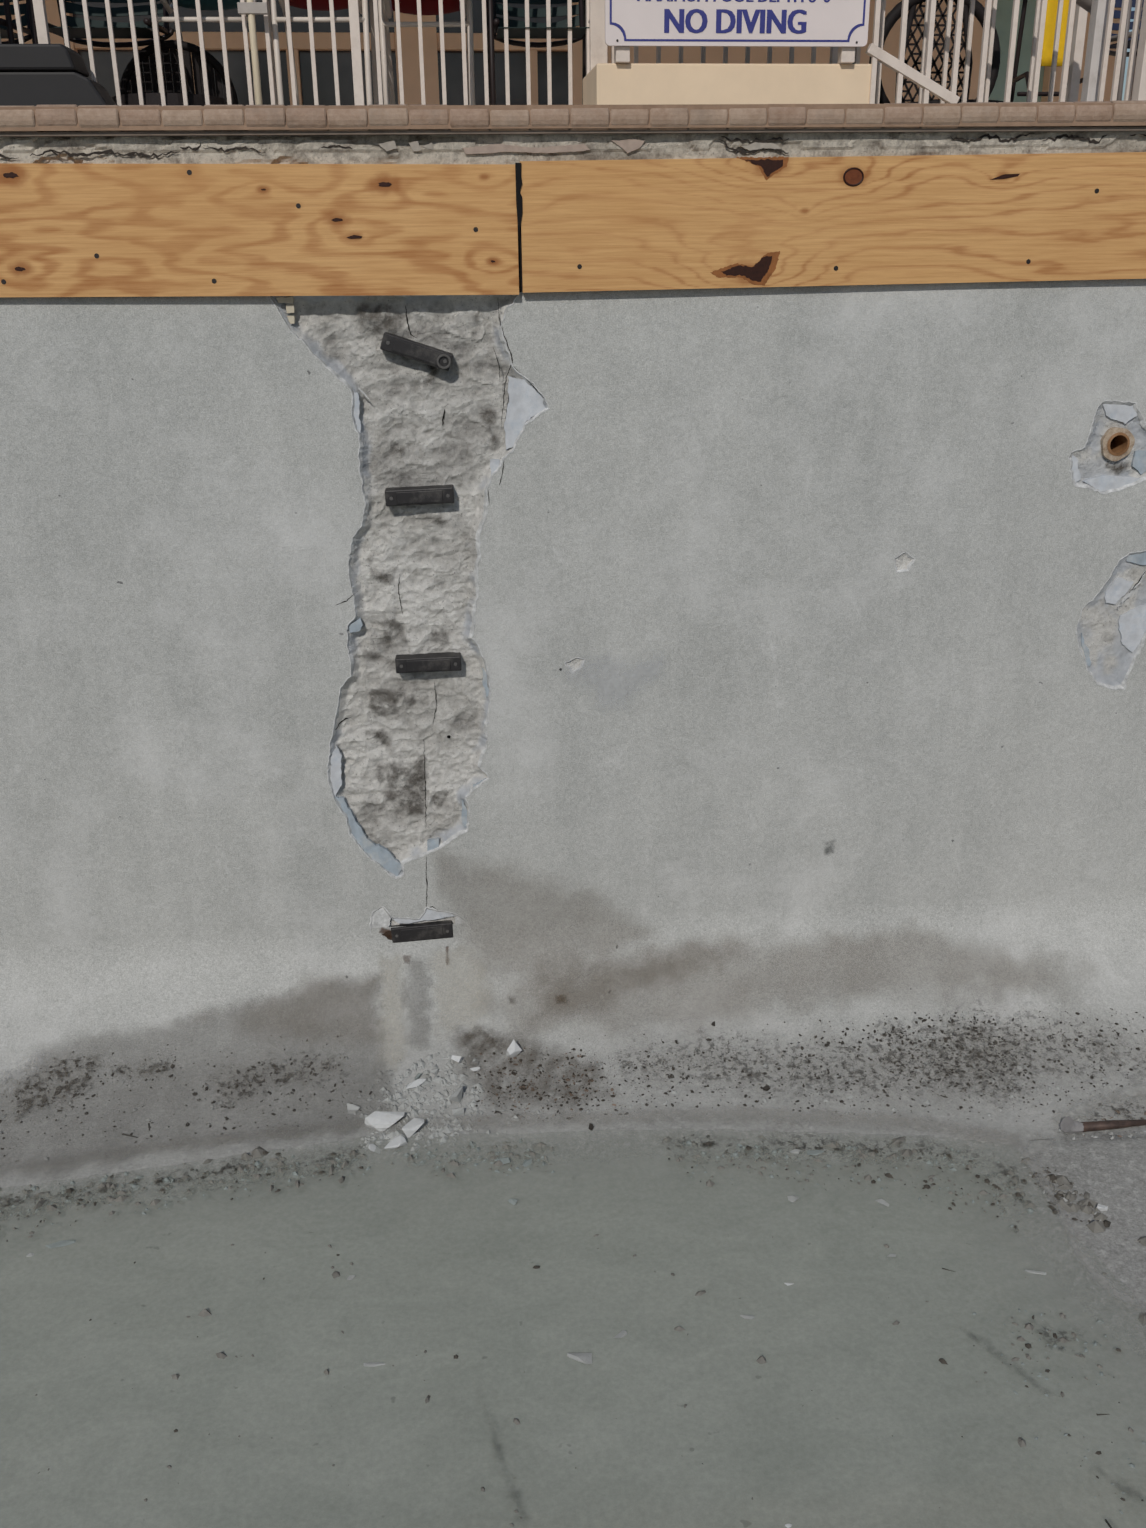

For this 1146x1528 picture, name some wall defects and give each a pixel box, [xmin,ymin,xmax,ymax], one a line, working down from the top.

flaking render [1068,400,1146,495]
spalling [268,292,550,879]
flaking render [1075,550,1146,690]
flaking render [369,906,471,935]